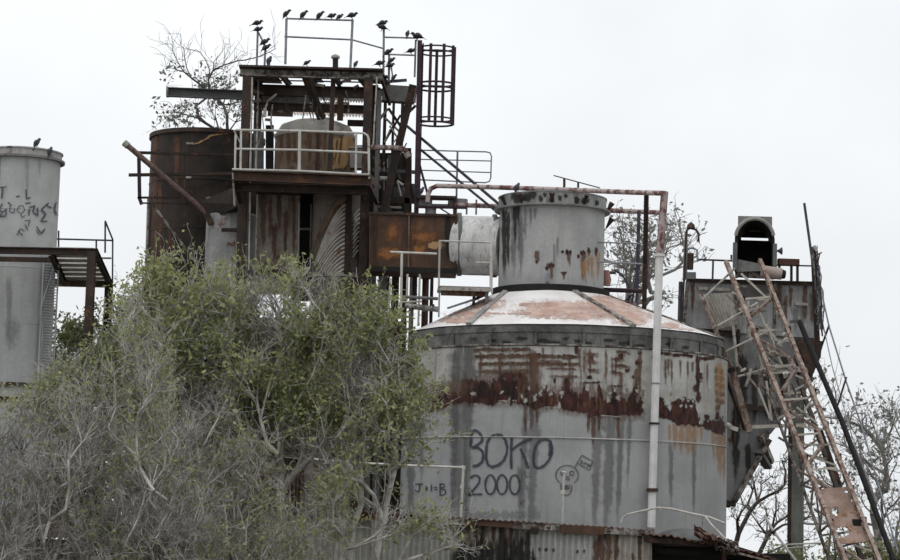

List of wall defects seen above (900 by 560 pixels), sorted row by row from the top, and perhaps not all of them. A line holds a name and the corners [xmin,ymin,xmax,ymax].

rust [152,135,174,265]
rust [369,214,457,278]
damp [501,189,599,270]
rust [534,247,600,279]
rust [440,295,651,326]
rust [661,322,693,331]
rust [468,346,642,442]
rust [660,351,725,410]
damp [453,525,555,560]
rust [593,534,619,560]